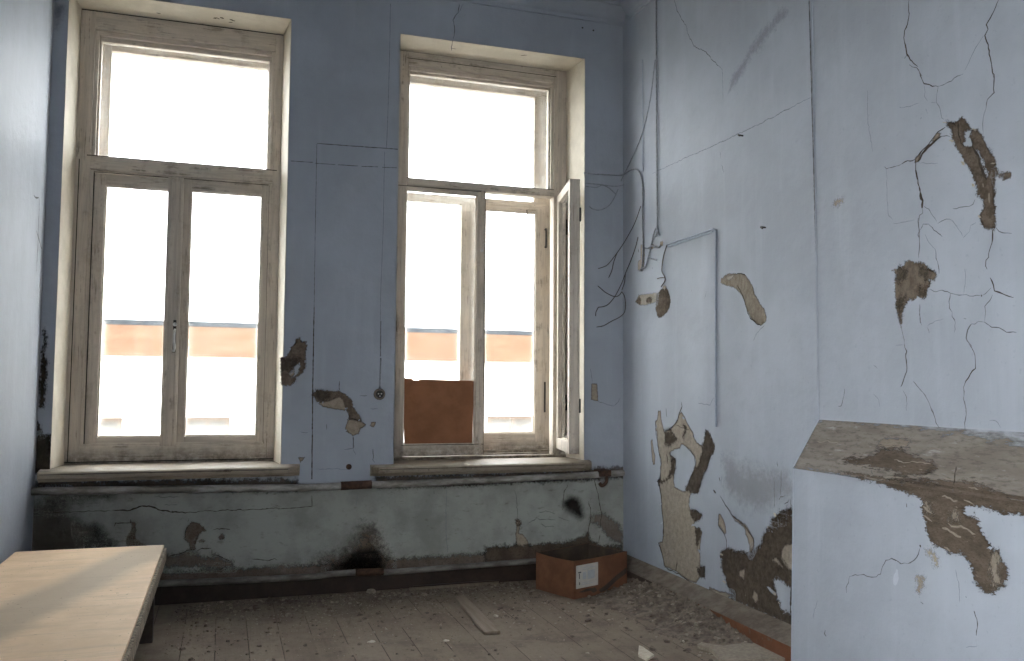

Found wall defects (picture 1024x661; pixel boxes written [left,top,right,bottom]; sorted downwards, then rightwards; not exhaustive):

spalling [942,116,1012,230]
crack [867,0,1016,428]
spalling [636,286,671,318]
spalling [721,273,766,326]
spalling [891,260,937,328]
spalling [279,337,308,386]
spalling [313,381,375,448]
spalling [165,520,233,570]
flaking render [651,402,792,624]
spalling [840,470,1024,595]